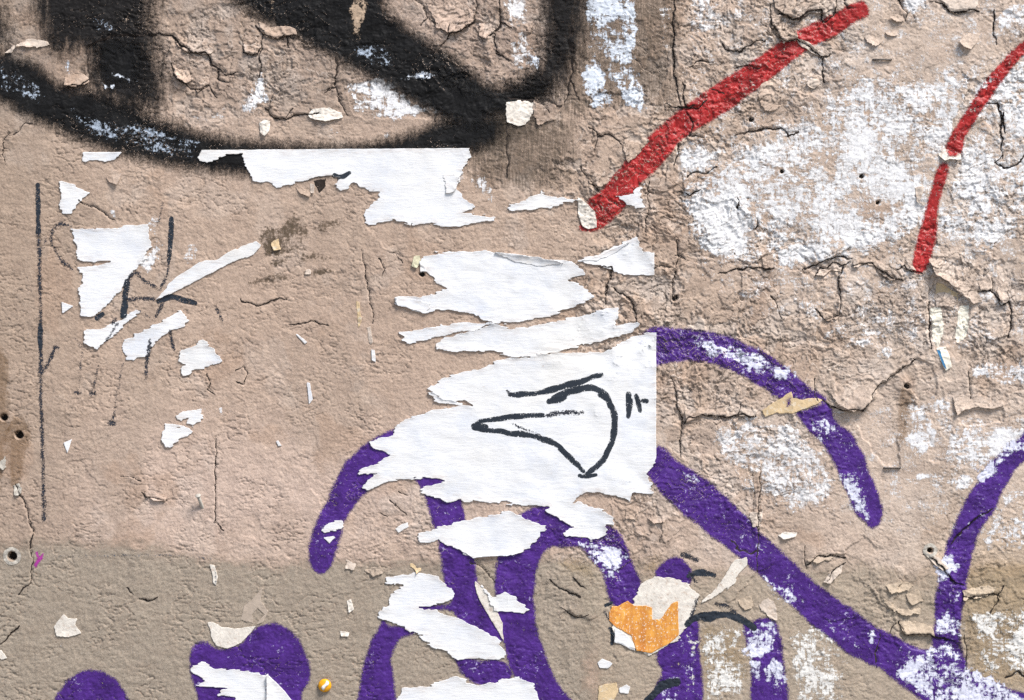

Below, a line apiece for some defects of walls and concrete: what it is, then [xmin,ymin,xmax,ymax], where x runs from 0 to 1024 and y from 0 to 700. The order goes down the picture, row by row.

crack [60,25,294,98]
peeling [426,0,539,69]
crack [898,0,997,45]
crack [635,0,856,196]
peeling [623,132,649,163]
crack [986,103,1024,169]
peeling [577,197,597,229]
peeling [412,256,427,277]
crack [802,255,923,320]
peeling [929,258,1009,371]
crack [671,378,756,457]
peeling [884,581,1023,700]